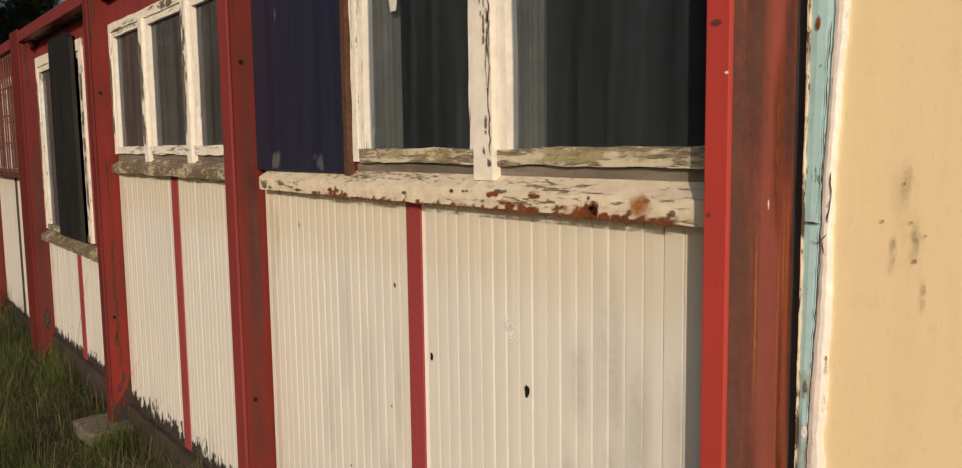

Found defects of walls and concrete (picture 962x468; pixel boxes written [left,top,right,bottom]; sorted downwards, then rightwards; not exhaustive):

peeling [479,0,488,57]
rust [726,0,765,468]
rust [776,223,792,468]